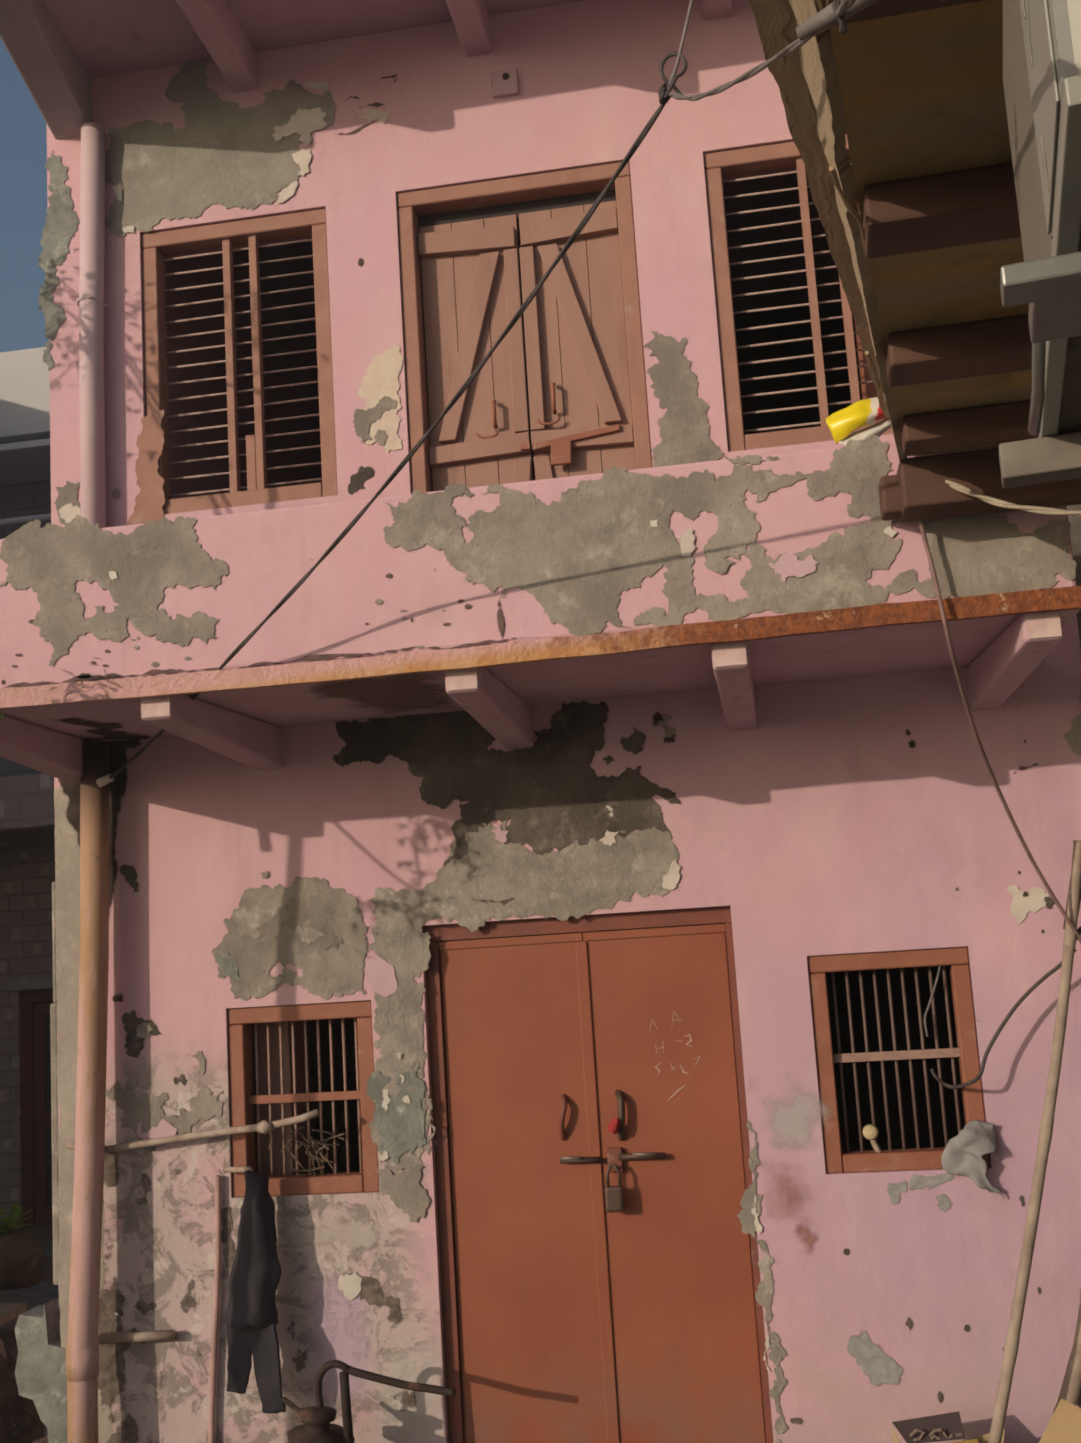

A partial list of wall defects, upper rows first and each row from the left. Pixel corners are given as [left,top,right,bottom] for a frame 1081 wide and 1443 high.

flaking render [105,59,336,237]
peeling [38,150,80,372]
peeling [0,409,228,666]
peeling [353,345,404,453]
peeling [383,328,1077,636]
flaking render [212,700,682,1223]
peeling [138,1173,151,1205]
peeling [134,1300,156,1314]
peeling [106,1051,223,1152]
peeling [221,1207,236,1268]
peeling [736,1119,802,1443]